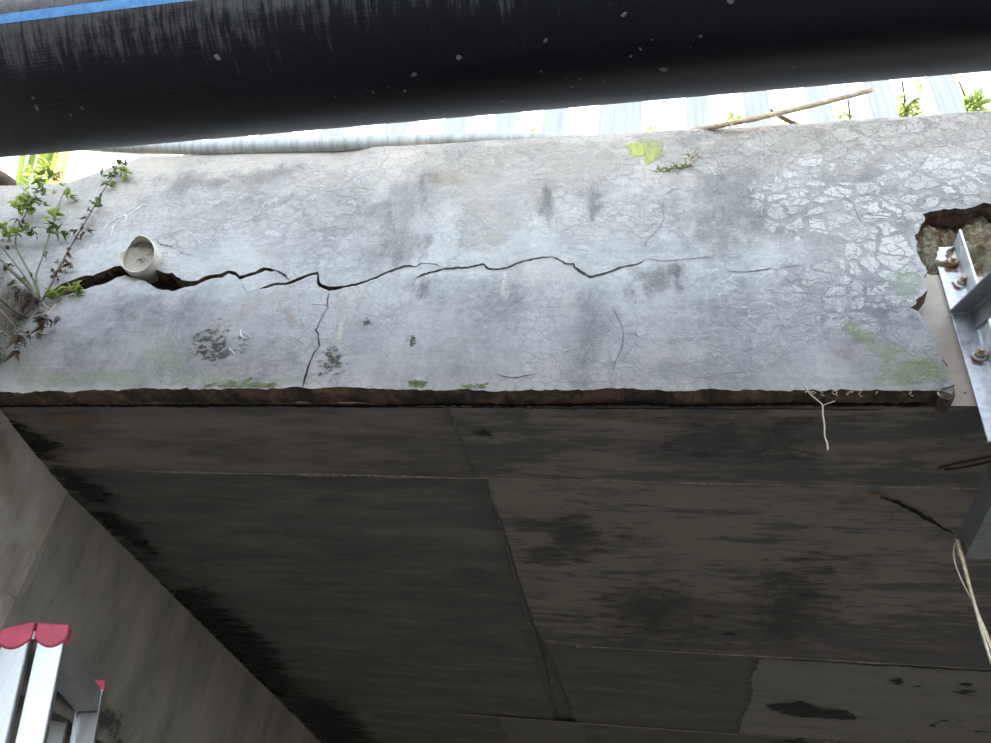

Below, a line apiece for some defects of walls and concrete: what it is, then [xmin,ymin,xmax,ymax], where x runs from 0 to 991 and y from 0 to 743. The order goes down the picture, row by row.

crack [0,164,929,410]
crack [376,111,991,378]
spalling [916,216,991,277]
damp [193,319,249,369]
damp [9,421,173,572]
damp [511,508,642,575]
damp [582,547,862,653]
damp [162,578,378,743]
damp [97,709,122,743]